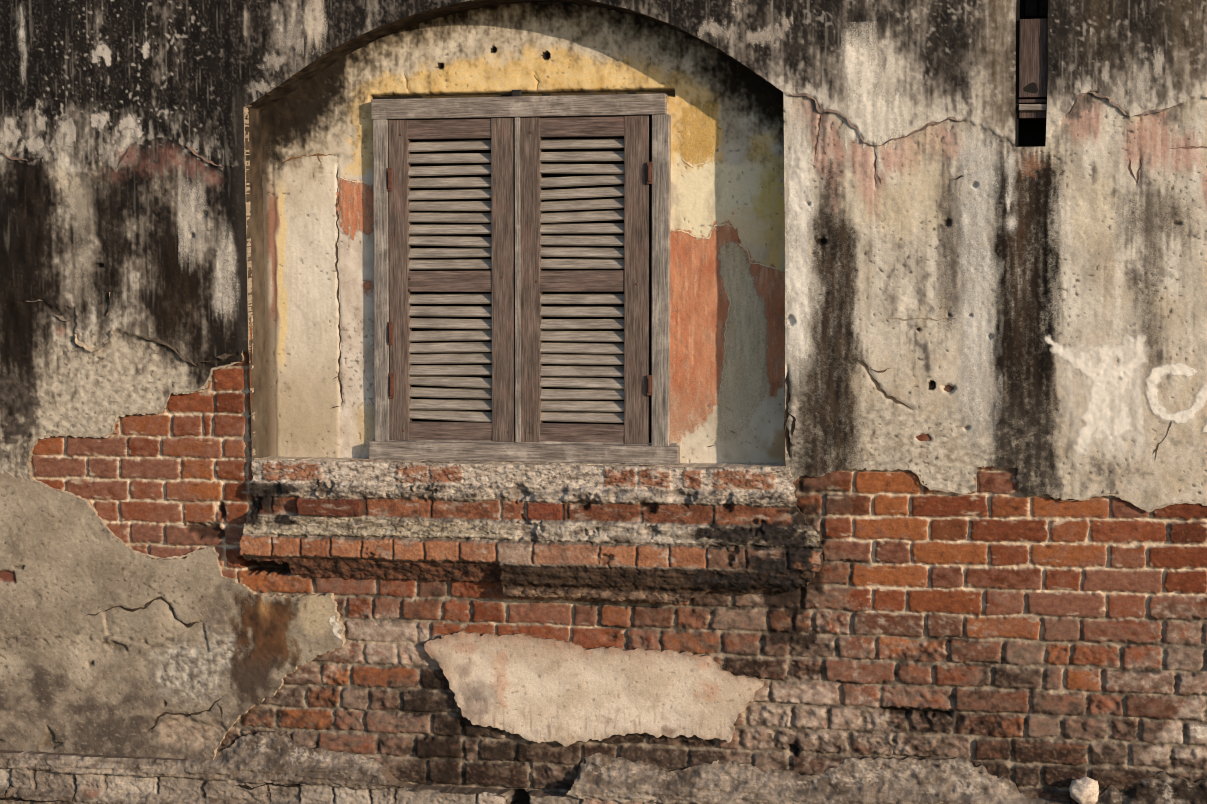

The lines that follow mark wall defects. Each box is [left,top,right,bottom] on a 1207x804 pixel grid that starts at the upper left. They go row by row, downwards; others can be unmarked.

damp [91,44,111,66]
damp [248,0,327,93]
damp [698,0,793,47]
crack [814,106,822,155]
damp [843,24,905,150]
damp [156,178,239,354]
peeling [337,177,374,240]
peeling [670,220,785,441]
damp [690,67,859,647]
damp [941,131,1062,497]
crack [87,596,199,628]
spalling [26,336,1207,804]